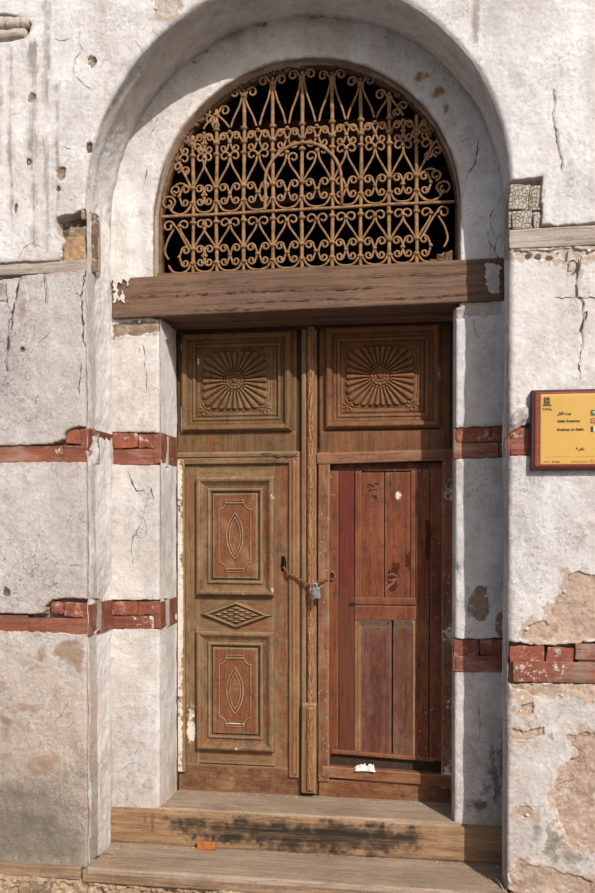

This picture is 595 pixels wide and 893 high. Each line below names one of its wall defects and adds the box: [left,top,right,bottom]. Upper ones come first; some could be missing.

water stain [0,0,68,260]
crack [552,94,562,170]
crack [1,282,20,371]
crack [554,251,595,379]
crack [131,479,154,565]
peeling [469,586,503,637]
peeling [521,572,595,643]
water stain [26,634,91,679]
peeling [509,680,595,715]
water stain [0,672,95,867]
peeling [549,732,595,847]
peeling [508,859,595,893]